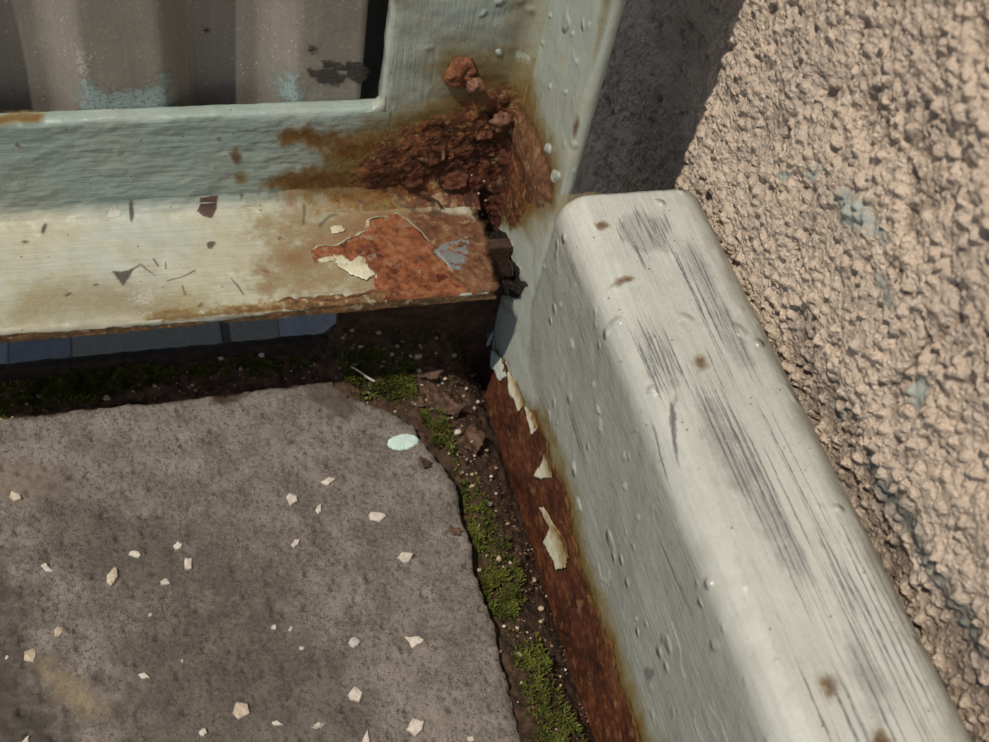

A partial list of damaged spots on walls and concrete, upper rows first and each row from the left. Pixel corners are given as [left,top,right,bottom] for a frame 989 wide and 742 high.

corrosion [0,112,43,125]
corrosion [260,46,561,238]
peeling [307,209,499,301]
peeling [486,303,539,435]
peeling [533,451,552,479]
peeling [539,507,569,571]
corrosion [480,335,648,742]